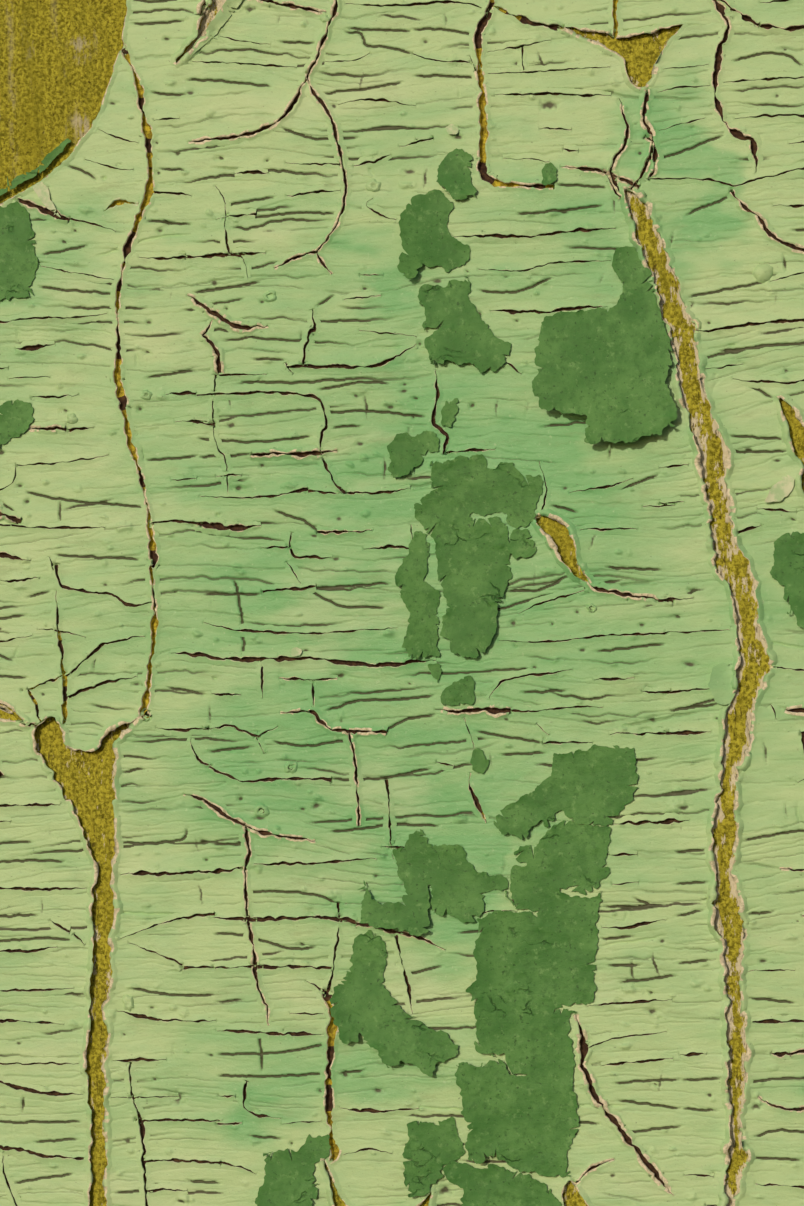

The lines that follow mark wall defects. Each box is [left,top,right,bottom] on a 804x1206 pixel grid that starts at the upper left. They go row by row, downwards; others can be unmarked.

peeling [0,0,133,301]
crack [0,0,804,826]
peeling [397,148,511,373]
peeling [387,398,591,706]
peeling [532,186,804,1206]
crack [0,1057,84,1102]
crack [0,1141,86,1206]
crack [0,882,87,1028]
peeling [0,704,151,1206]
crack [111,778,446,1206]
peeling [330,744,639,1206]
crack [572,994,719,1206]